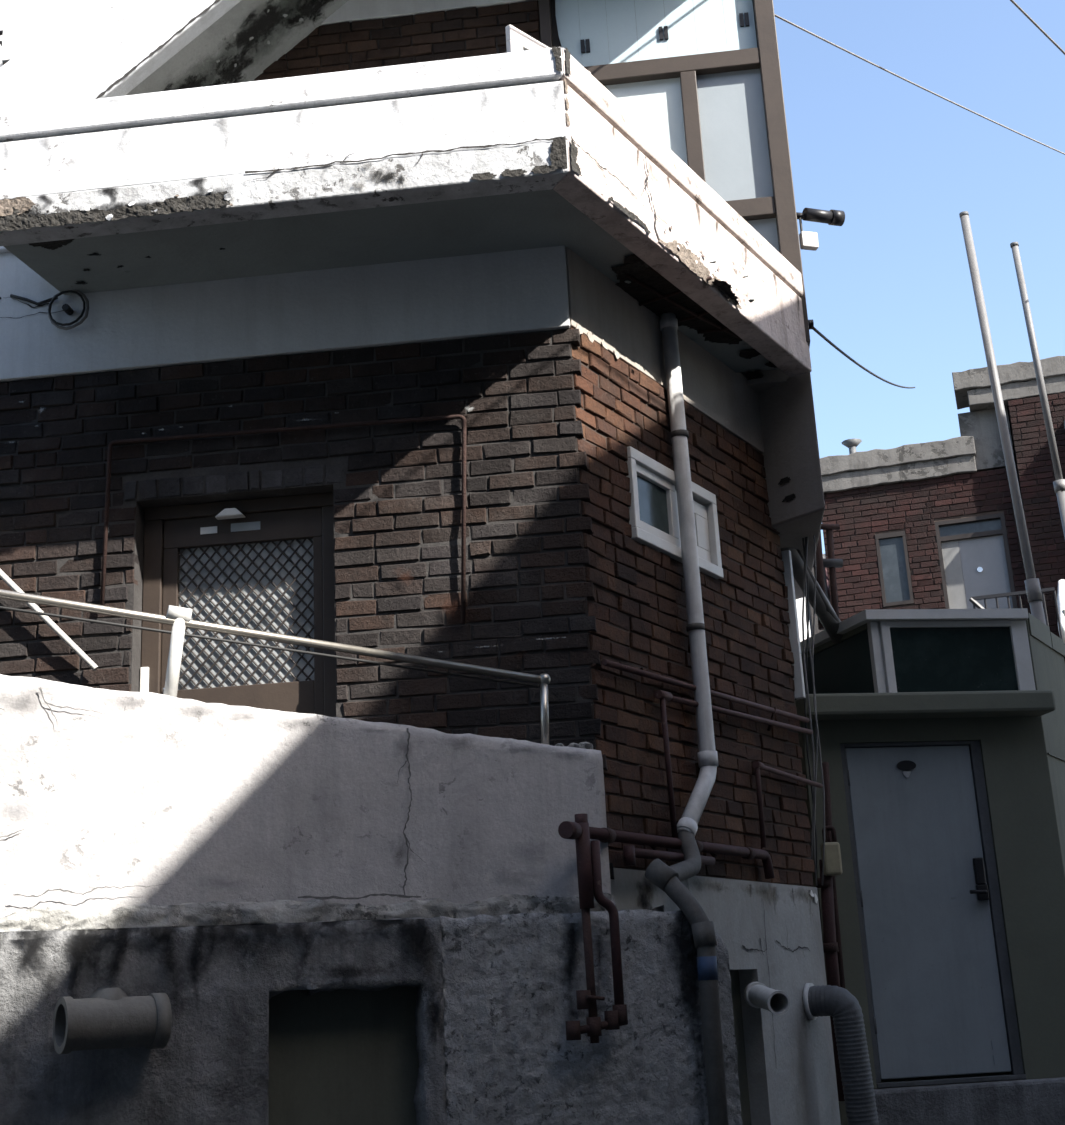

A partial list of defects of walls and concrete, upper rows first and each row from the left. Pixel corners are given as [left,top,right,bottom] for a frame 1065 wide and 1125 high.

peeling [352,162,405,188]
spalling [0,189,233,231]
spalling [28,239,74,250]